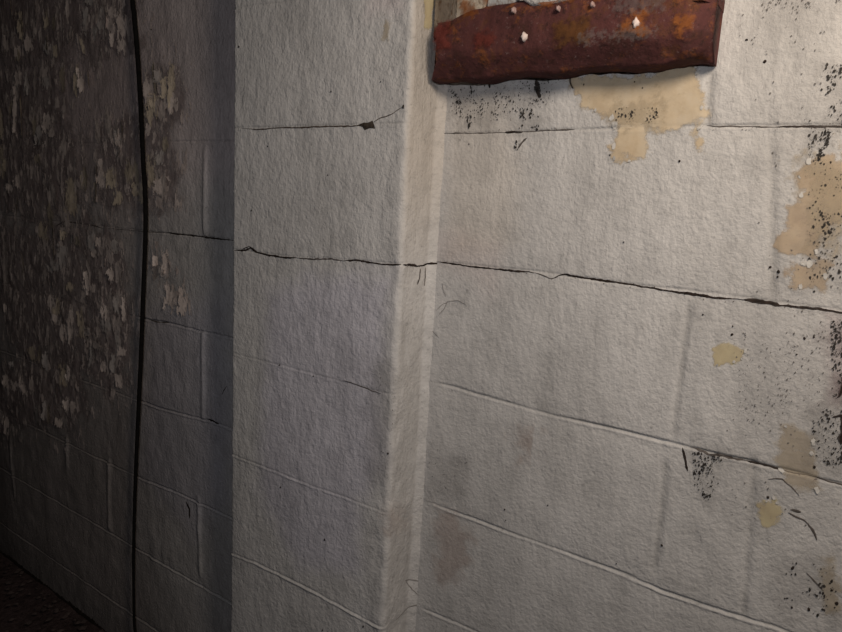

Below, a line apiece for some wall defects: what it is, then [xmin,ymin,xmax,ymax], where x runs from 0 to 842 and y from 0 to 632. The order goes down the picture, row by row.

rust [621,10,651,37]
crack [242,108,401,130]
mould [448,79,559,131]
crack [444,127,575,135]
peeling [570,65,710,164]
crack [707,123,842,131]
peeling [769,154,842,291]
crack [56,221,842,314]
peeling [712,325,747,366]
mould [738,299,842,468]
crack [682,447,842,540]